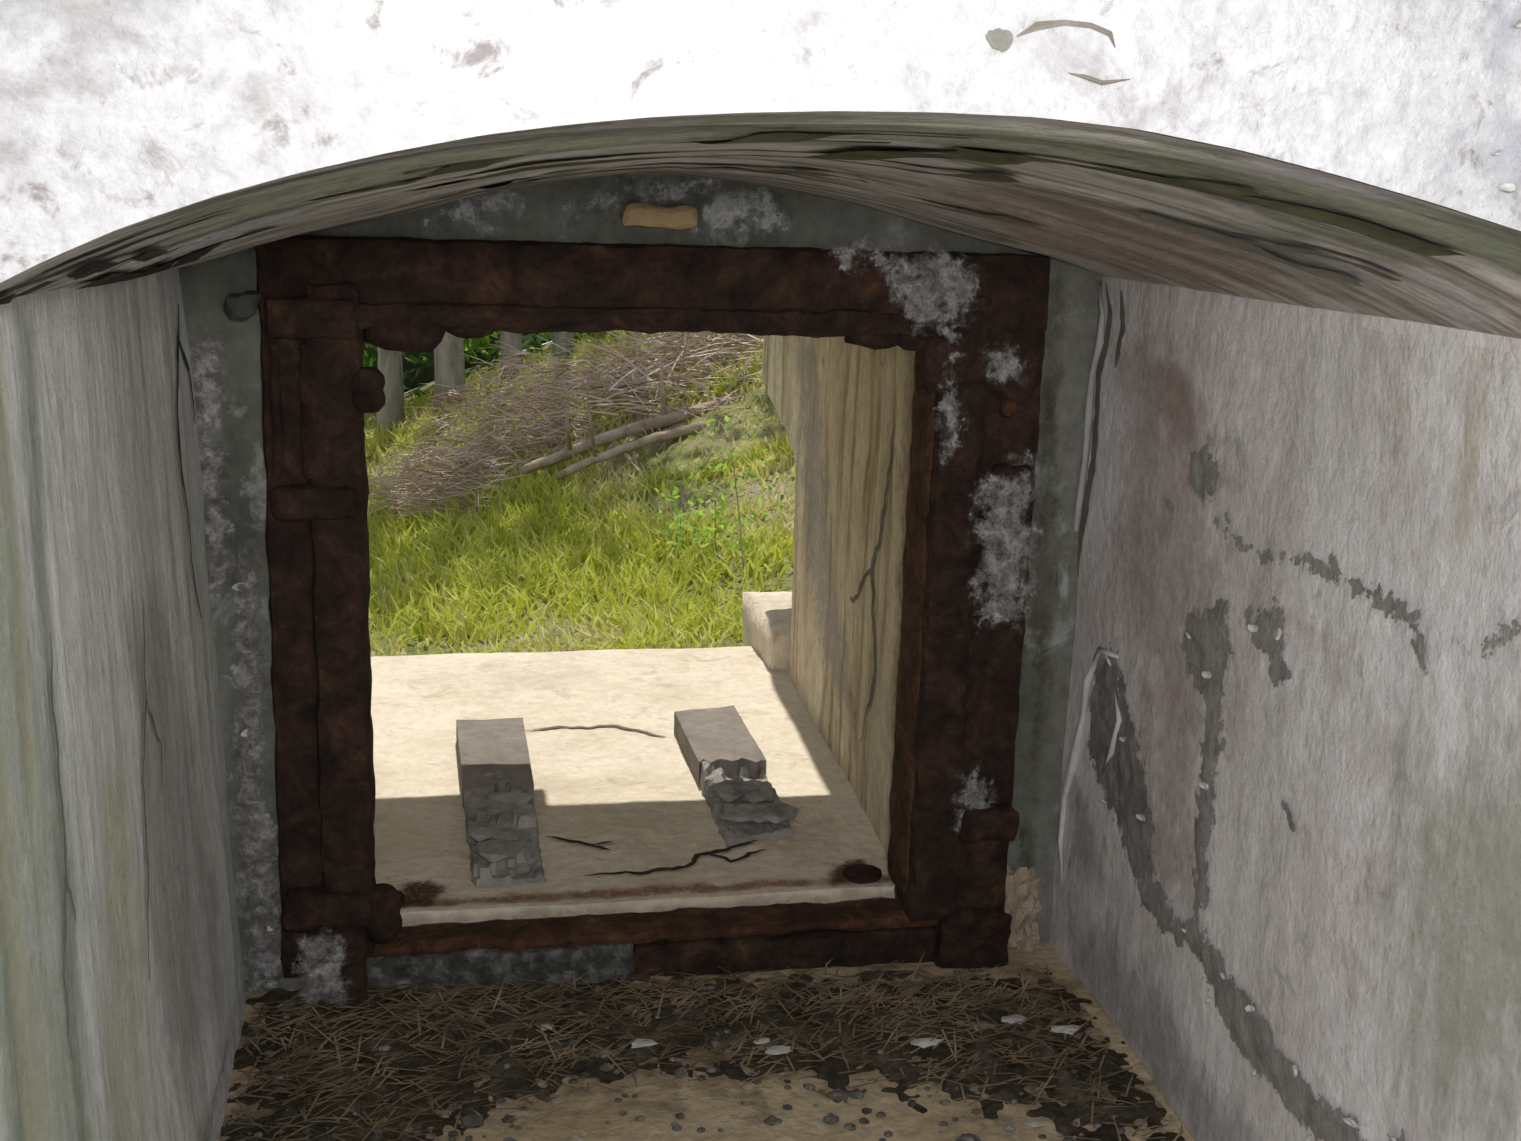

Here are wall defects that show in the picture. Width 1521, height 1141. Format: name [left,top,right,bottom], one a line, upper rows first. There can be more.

water stain [425,189,522,232]
water stain [628,173,787,231]
flaking render [1188,443,1218,502]
water stain [970,472,1042,626]
crack [1201,489,1428,675]
crack [1481,620,1521,660]
rust [400,860,865,907]
crack [547,836,766,876]